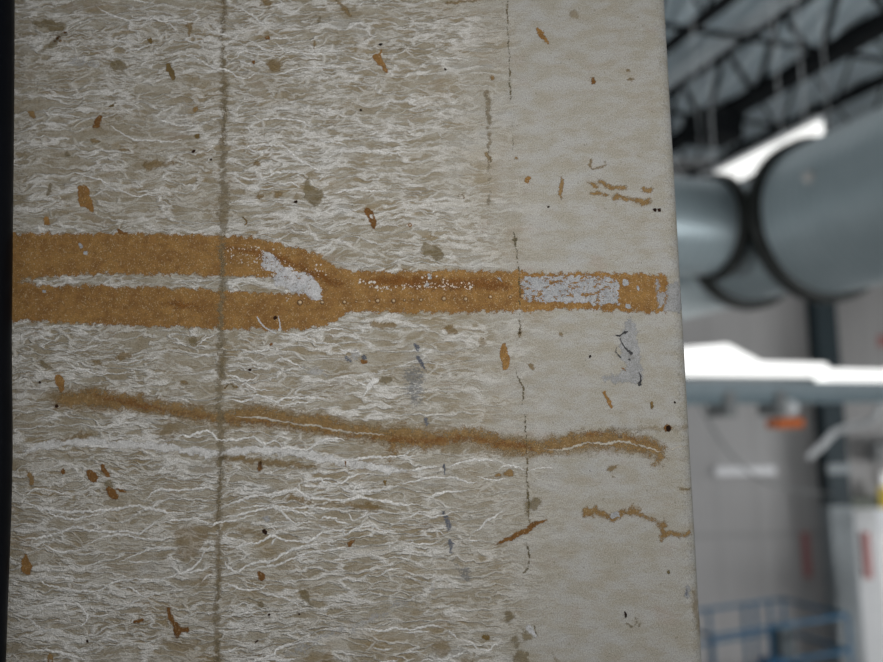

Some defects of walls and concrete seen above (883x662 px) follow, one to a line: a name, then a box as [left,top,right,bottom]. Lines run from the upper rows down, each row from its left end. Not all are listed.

crack [505,1,513,100]
corrosion [587,180,654,206]
peeling [311,282,321,301]
corrosion [12,216,669,334]
crack [512,232,521,331]
corrosion [52,374,666,467]
corrosion [495,519,547,545]
corrosion [582,505,692,542]